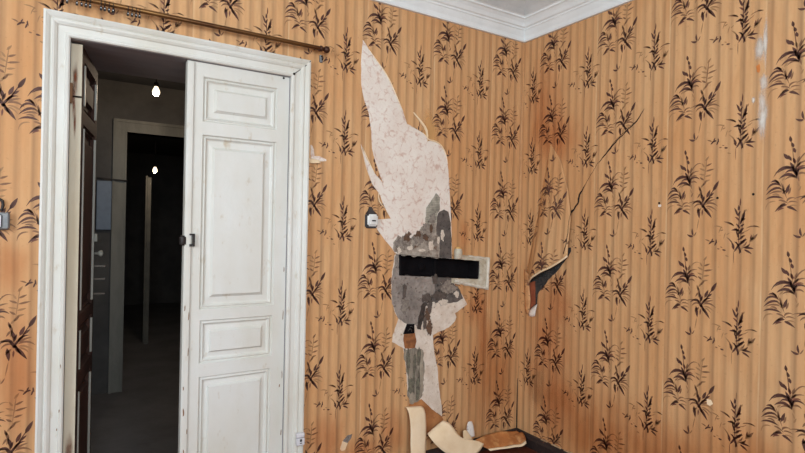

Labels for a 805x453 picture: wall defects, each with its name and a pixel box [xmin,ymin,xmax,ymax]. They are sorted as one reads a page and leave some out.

crack [563,111,643,254]
flaking render [391,210,463,404]
flaking render [530,247,571,308]